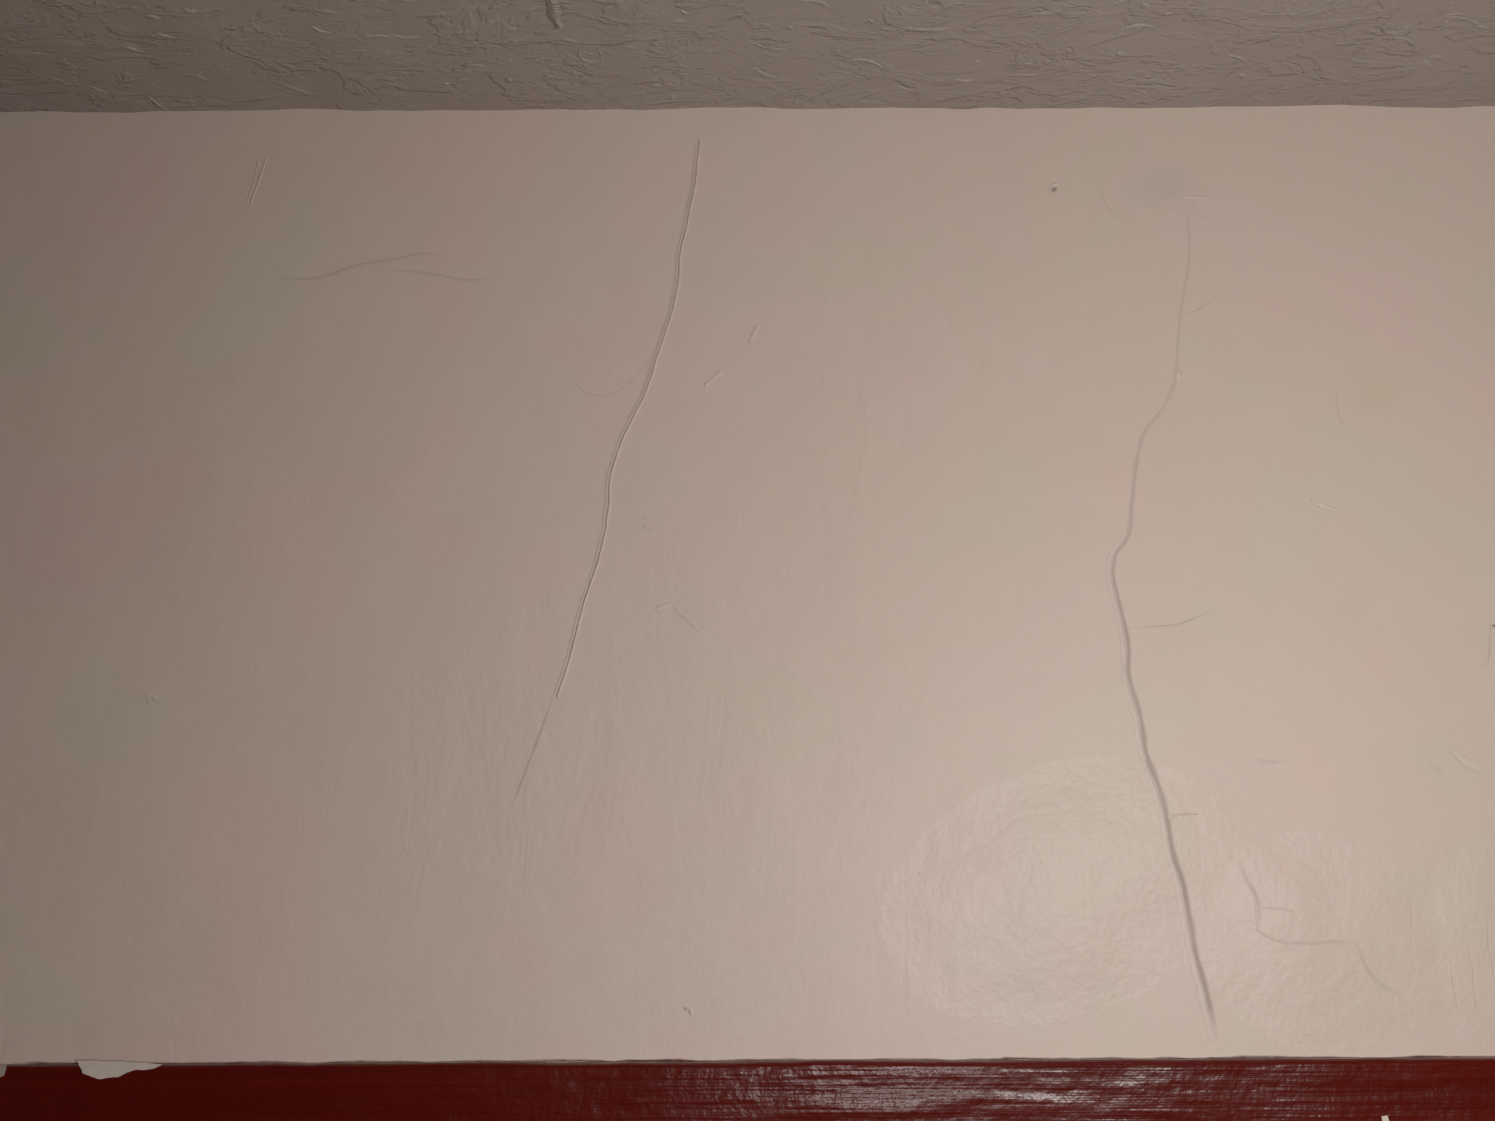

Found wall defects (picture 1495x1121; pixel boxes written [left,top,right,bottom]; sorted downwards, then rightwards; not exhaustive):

crack [1106,213,1219,1043]
peeling [78,1060,162,1079]